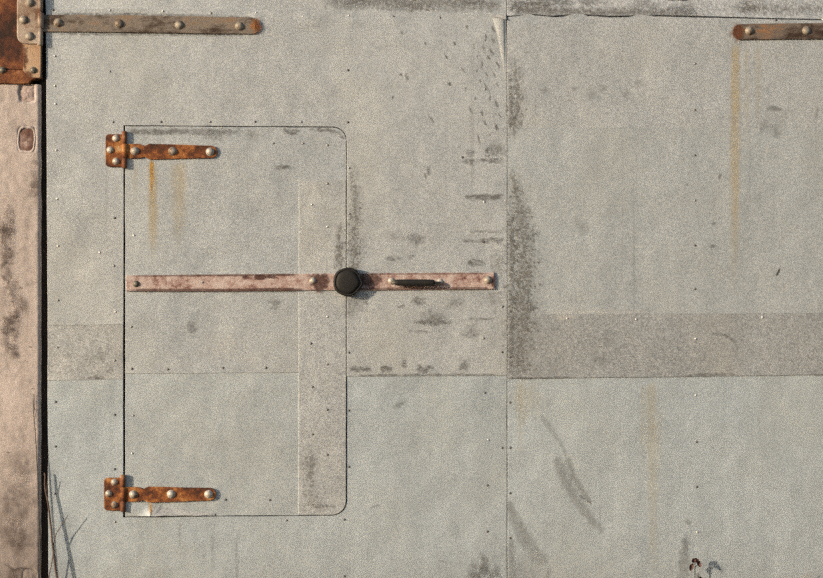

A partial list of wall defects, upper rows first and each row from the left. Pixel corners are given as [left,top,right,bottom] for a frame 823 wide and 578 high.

rust [511,0,690,16]
leakage [0,224,13,284]
leakage [3,310,18,357]